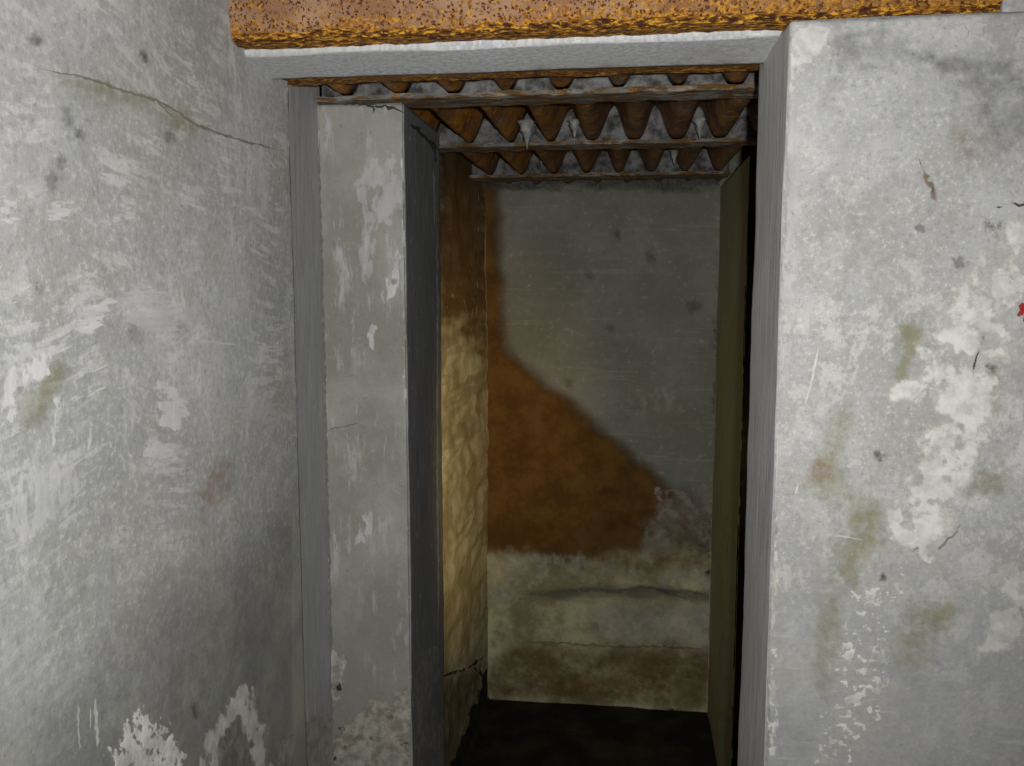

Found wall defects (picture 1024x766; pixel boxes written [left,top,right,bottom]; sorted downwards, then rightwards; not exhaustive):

corrosion [439,152,670,558]
spalling [222,720,253,766]
spalling [333,688,411,766]